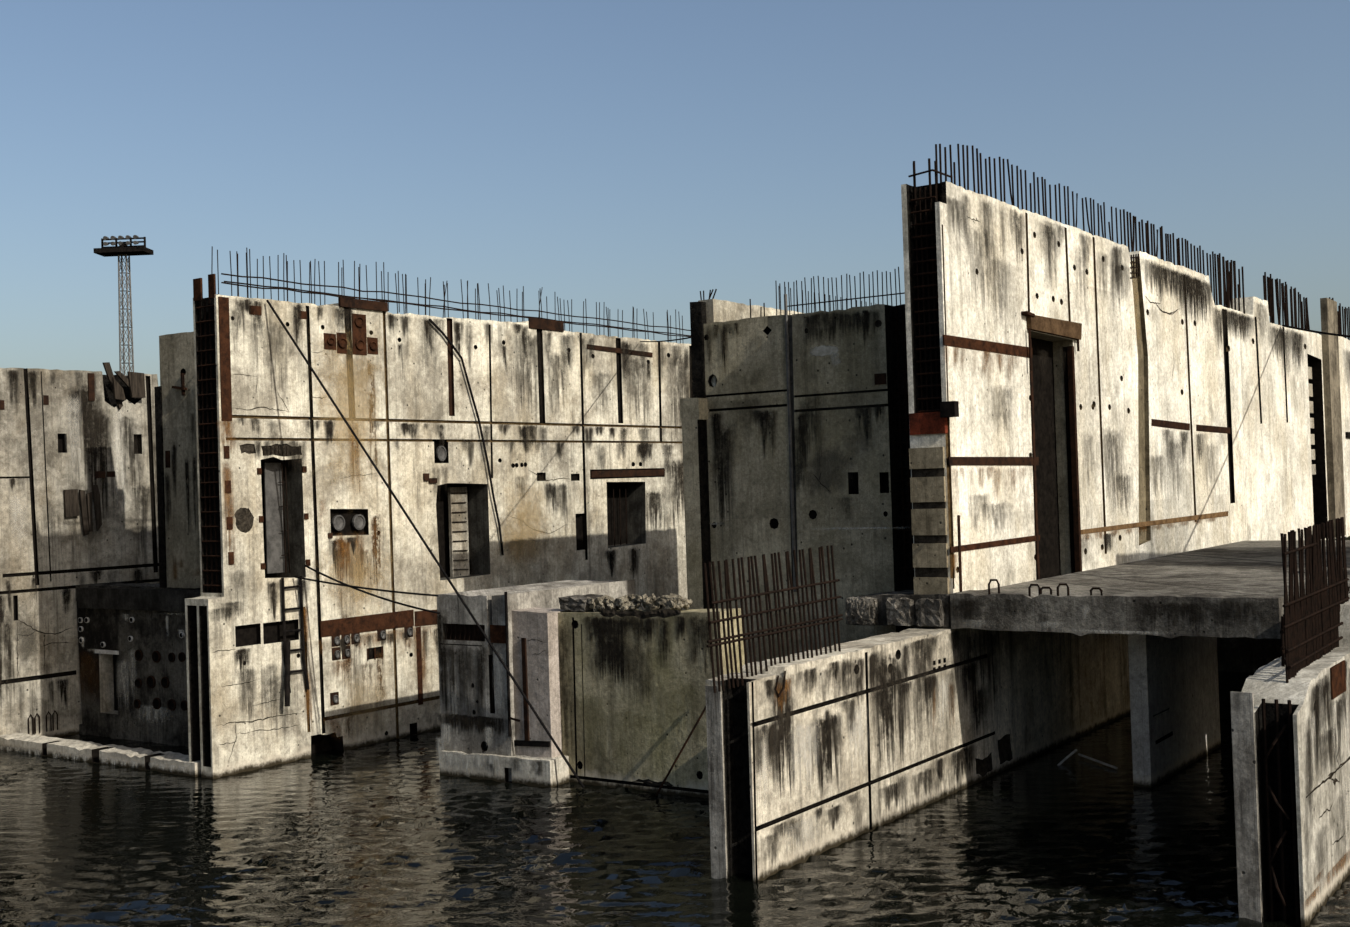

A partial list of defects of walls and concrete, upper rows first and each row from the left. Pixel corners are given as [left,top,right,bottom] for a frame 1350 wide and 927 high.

leakage [1083,236,1124,301]
leakage [707,323,738,367]
leakage [806,311,878,356]
leakage [9,370,35,402]
rust [349,364,377,478]
rust [338,516,381,585]
leakage [0,581,36,701]
leakage [558,627,572,743]
leakage [585,616,712,693]
leakage [756,600,998,808]
leakage [767,819,800,864]
leakage [818,794,860,829]